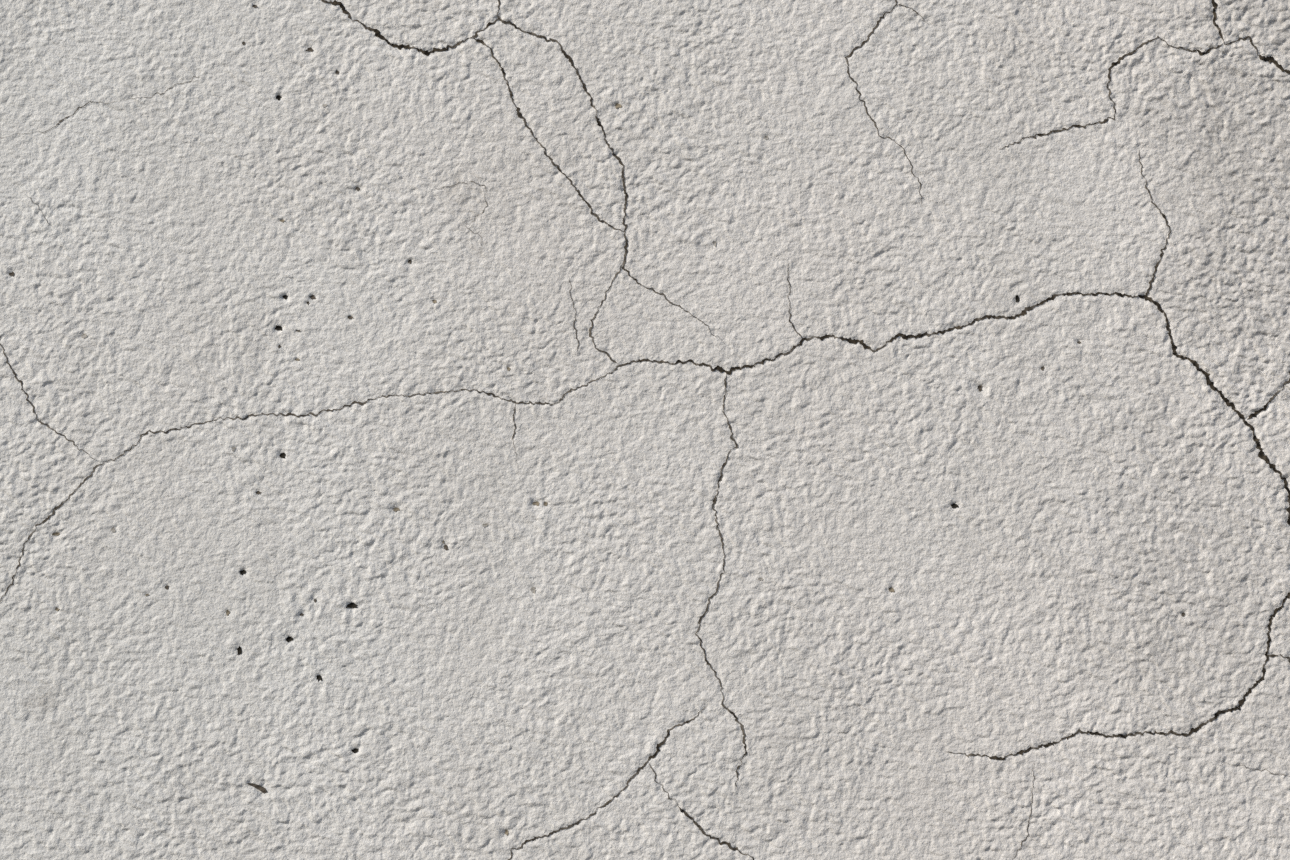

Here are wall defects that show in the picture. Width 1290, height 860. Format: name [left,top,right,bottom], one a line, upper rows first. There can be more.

crack [0,75,201,138]
crack [321,0,717,336]
crack [845,0,925,202]
crack [1002,0,1290,149]
crack [0,154,1290,787]
crack [508,708,754,860]
crack [947,592,1290,859]